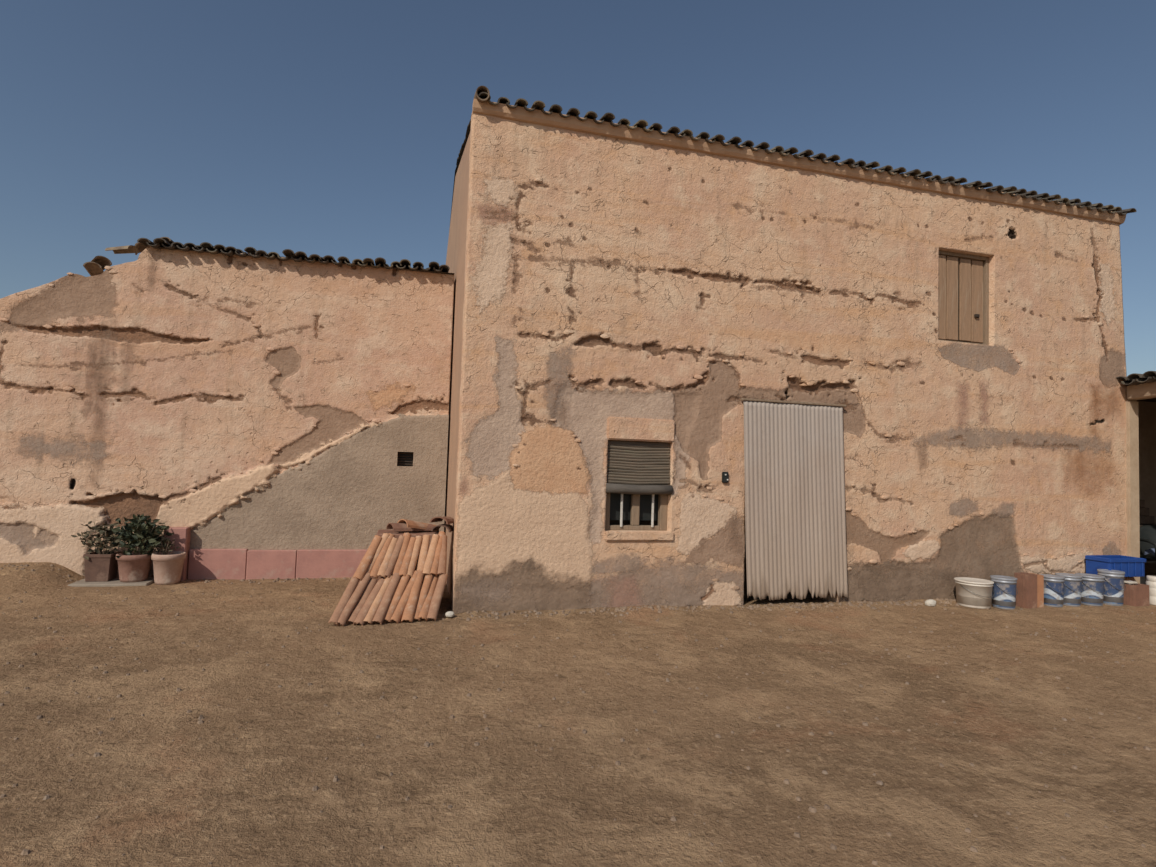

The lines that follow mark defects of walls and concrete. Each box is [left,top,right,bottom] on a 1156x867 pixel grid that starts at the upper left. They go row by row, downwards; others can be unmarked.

spalling [0,318,212,344]
crack [510,178,925,505]
crack [1023,231,1107,358]
flaking render [265,346,449,465]
flaking render [464,335,527,480]
flaking render [551,357,866,544]
crack [1013,440,1079,450]
flaking render [845,507,930,563]